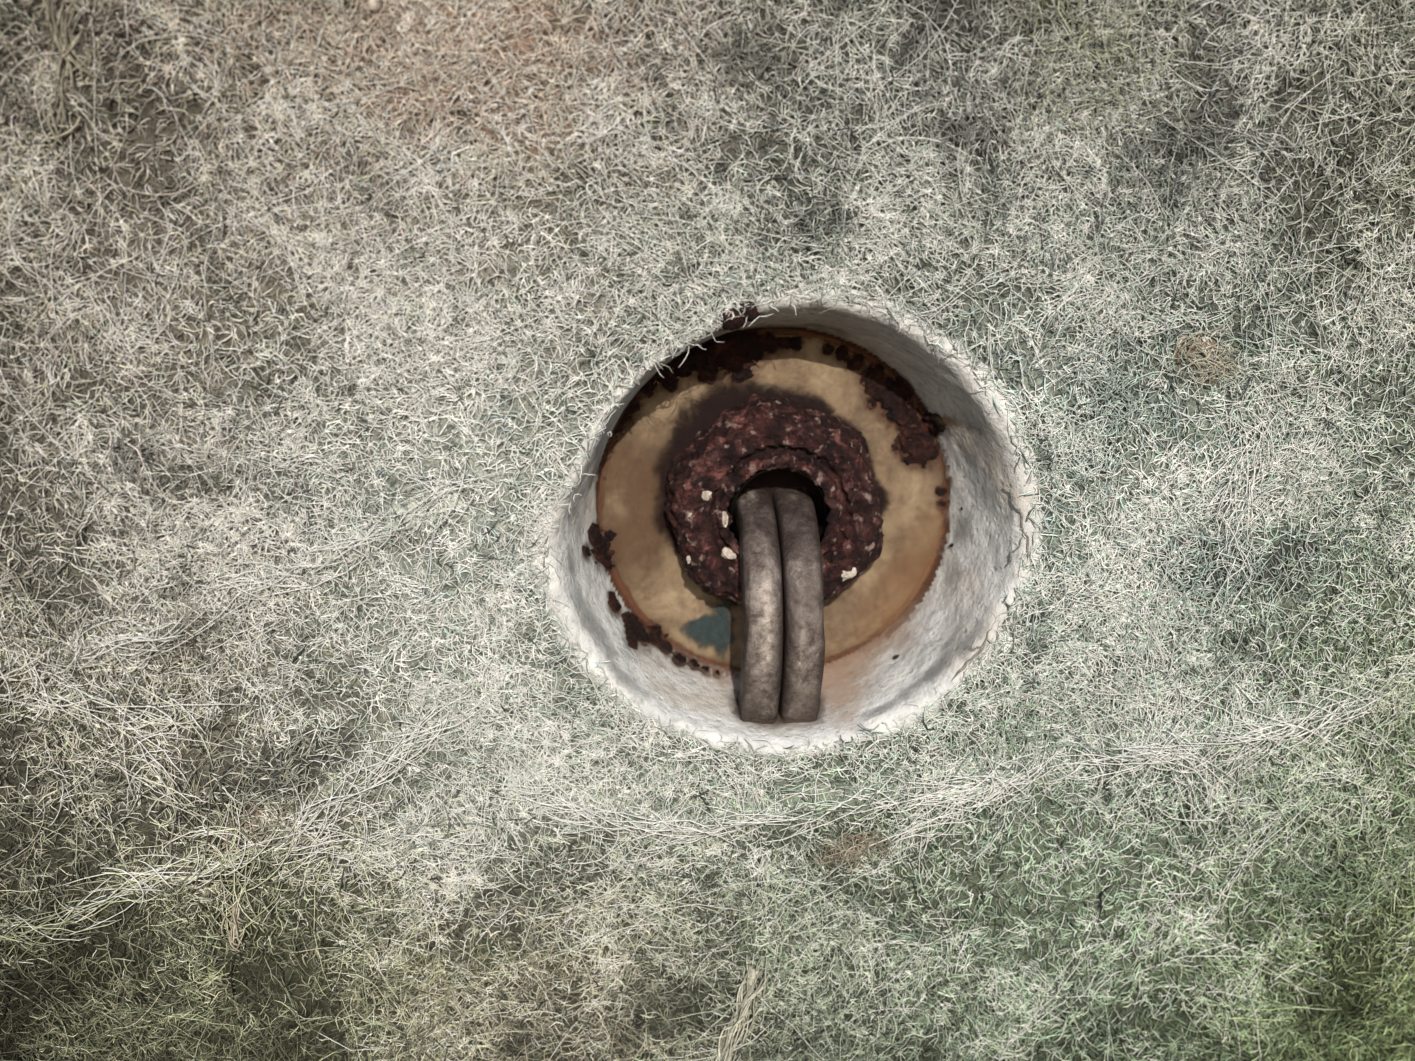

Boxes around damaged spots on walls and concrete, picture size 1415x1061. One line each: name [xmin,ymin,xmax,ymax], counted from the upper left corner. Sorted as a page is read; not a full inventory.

corrosion [582,298,963,724]